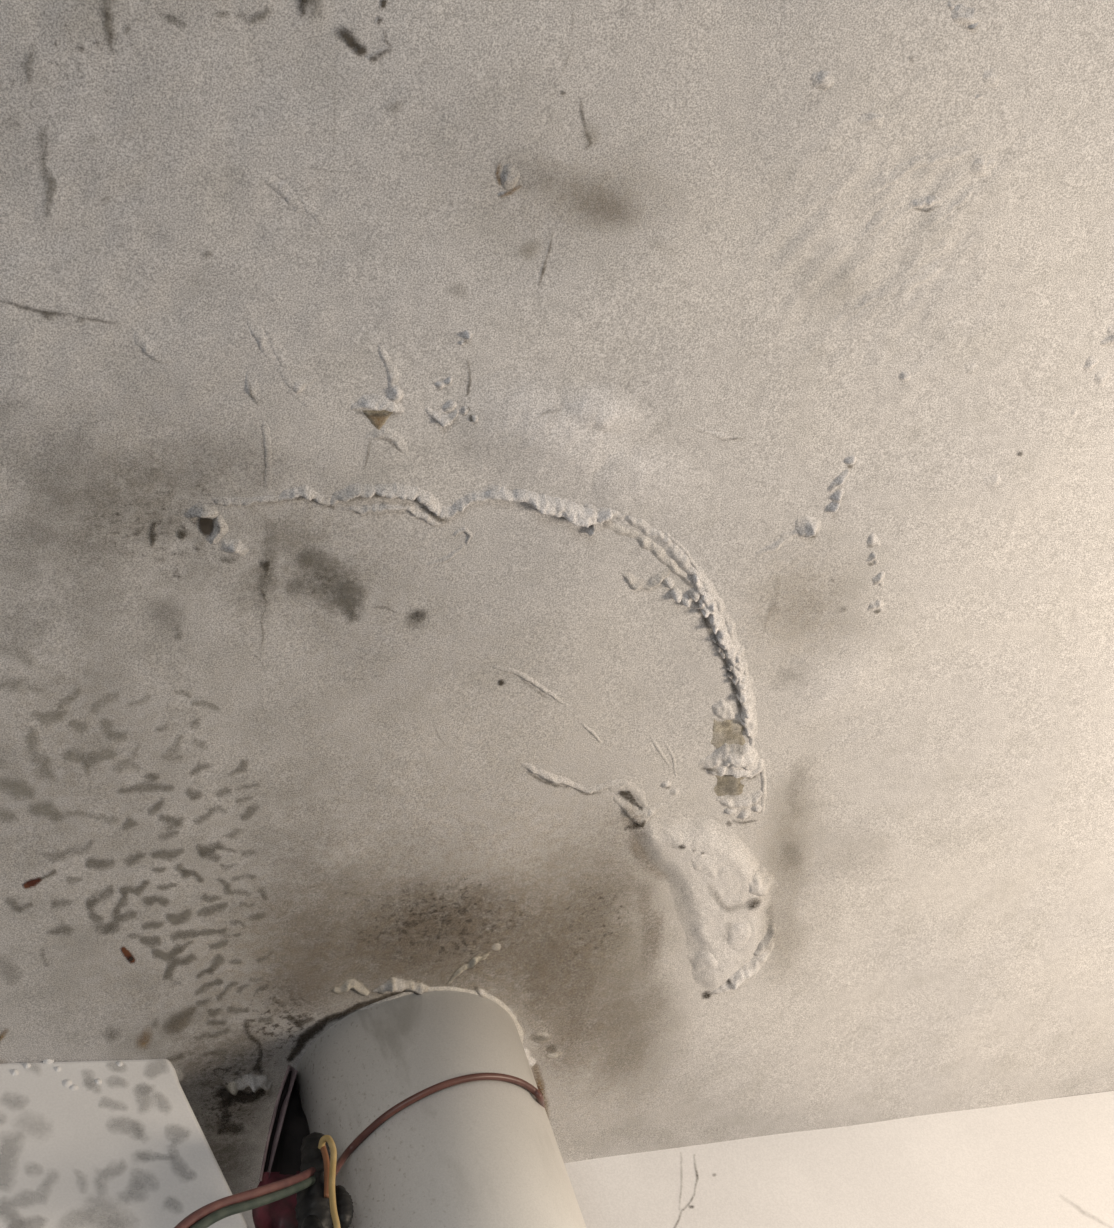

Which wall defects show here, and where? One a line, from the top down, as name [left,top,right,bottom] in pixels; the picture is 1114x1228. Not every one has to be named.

spalling [351,344,409,456]
peeling [425,376,478,427]
crack [492,665,602,743]
damp [120,775,180,836]
crack [521,763,622,794]
crack [649,734,680,796]
damp [87,850,311,1126]